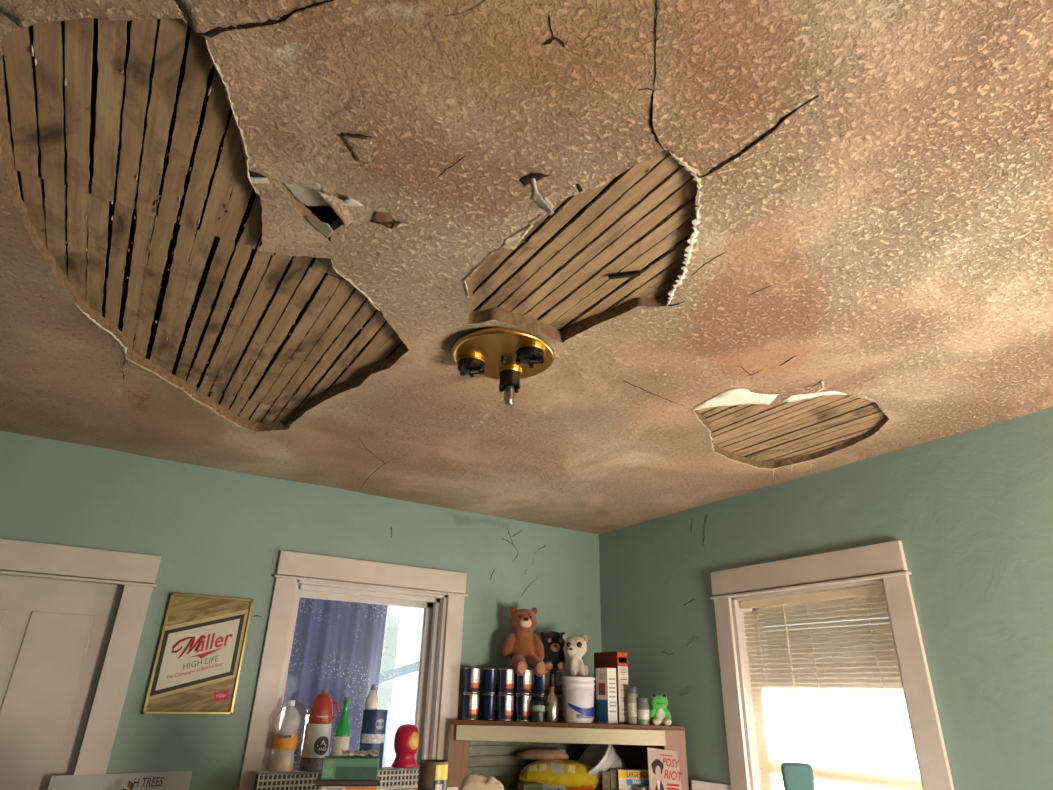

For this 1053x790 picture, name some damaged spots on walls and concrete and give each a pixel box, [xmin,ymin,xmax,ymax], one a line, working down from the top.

crack [174,0,189,20]
crack [640,0,681,151]
crack [700,95,828,188]
spalling [0,0,403,430]
peeling [371,211,420,229]
spalling [463,150,703,331]
spalling [694,381,885,478]
crack [490,529,546,599]